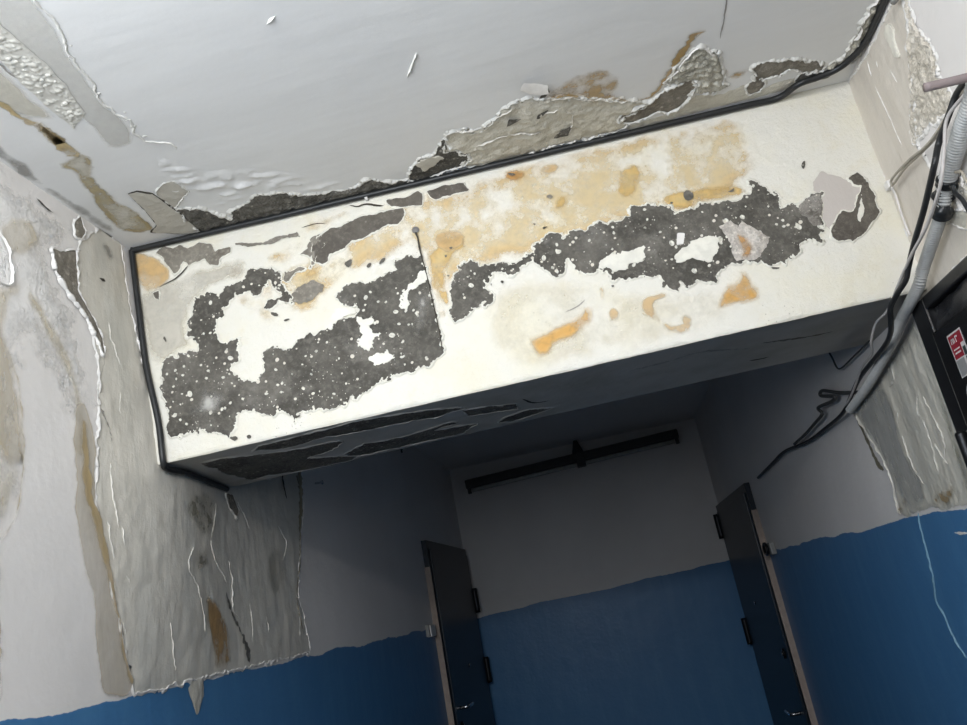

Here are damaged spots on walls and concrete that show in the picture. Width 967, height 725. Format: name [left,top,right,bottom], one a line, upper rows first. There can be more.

peeling [33,0,177,150]
water stain [136,254,241,358]
water stain [283,267,326,289]
water stain [350,233,399,266]
water stain [407,152,652,303]
spalling [128,0,953,441]
water stain [621,140,648,153]
water stain [665,126,745,209]
peeling [919,175,967,300]
peeling [0,188,548,714]
peeling [852,322,967,517]
water stain [74,404,134,696]